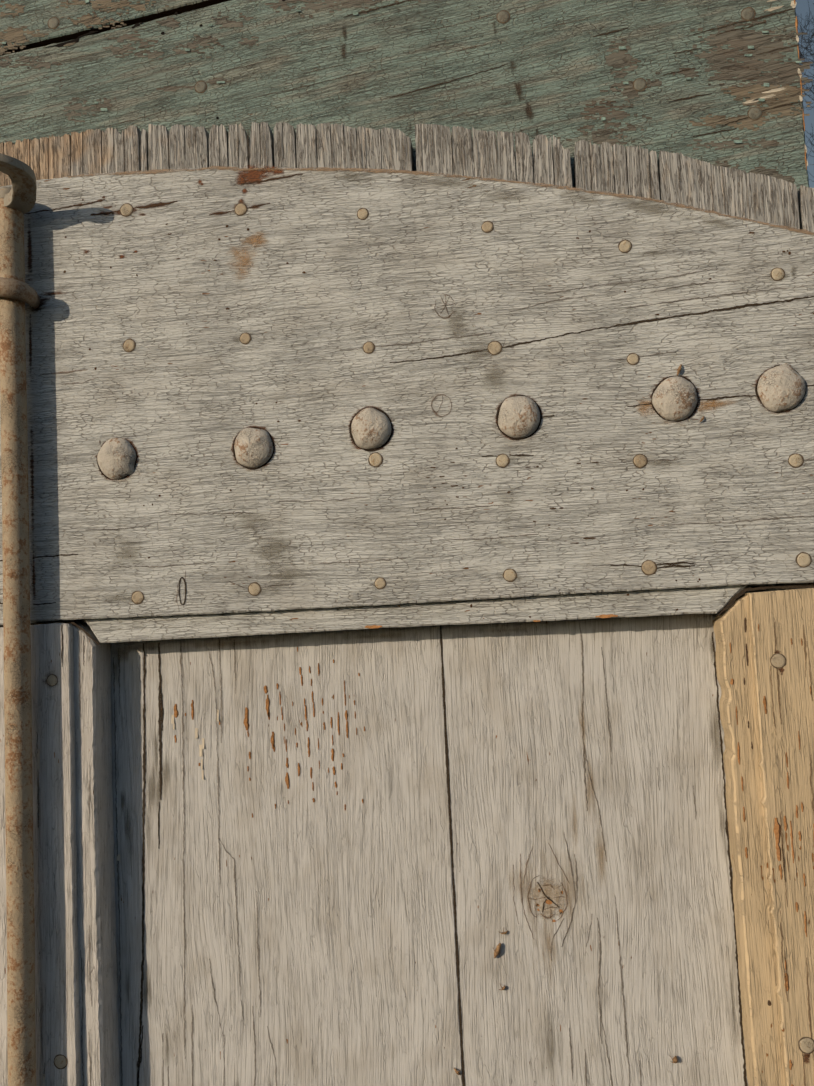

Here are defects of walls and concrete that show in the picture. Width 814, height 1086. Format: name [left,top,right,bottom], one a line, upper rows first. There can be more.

peeling [0,0,259,70]
crack [0,14,523,216]
peeling [557,0,813,183]
rust [212,165,284,215]
rust [29,292,62,371]
crack [335,268,814,363]
crack [610,561,695,569]
peeling [161,698,204,780]
peeling [264,663,365,810]
crack [579,623,612,862]
peeling [773,802,814,880]
crack [551,835,642,1086]